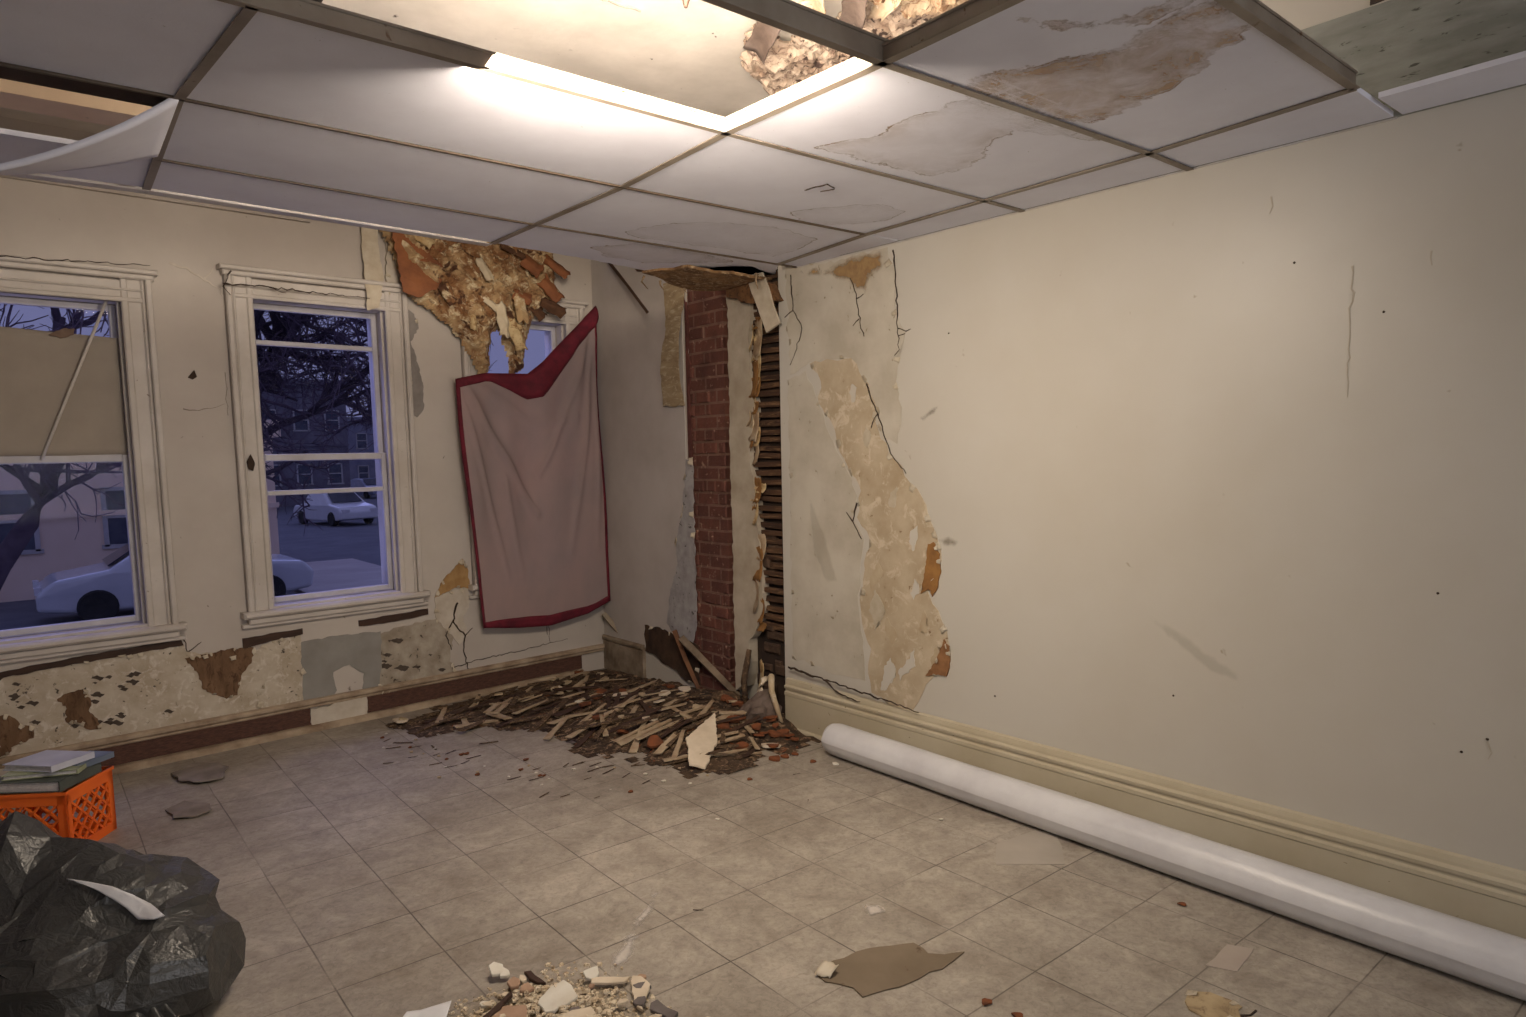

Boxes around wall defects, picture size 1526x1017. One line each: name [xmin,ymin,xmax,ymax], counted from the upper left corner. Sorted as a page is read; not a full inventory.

spalling [739,21,853,96]
spalling [799,0,968,40]
water stain [989,52,1110,107]
peeling [361,227,401,310]
peeling [408,310,424,417]
peeling [644,247,951,712]
peeling [0,635,307,758]